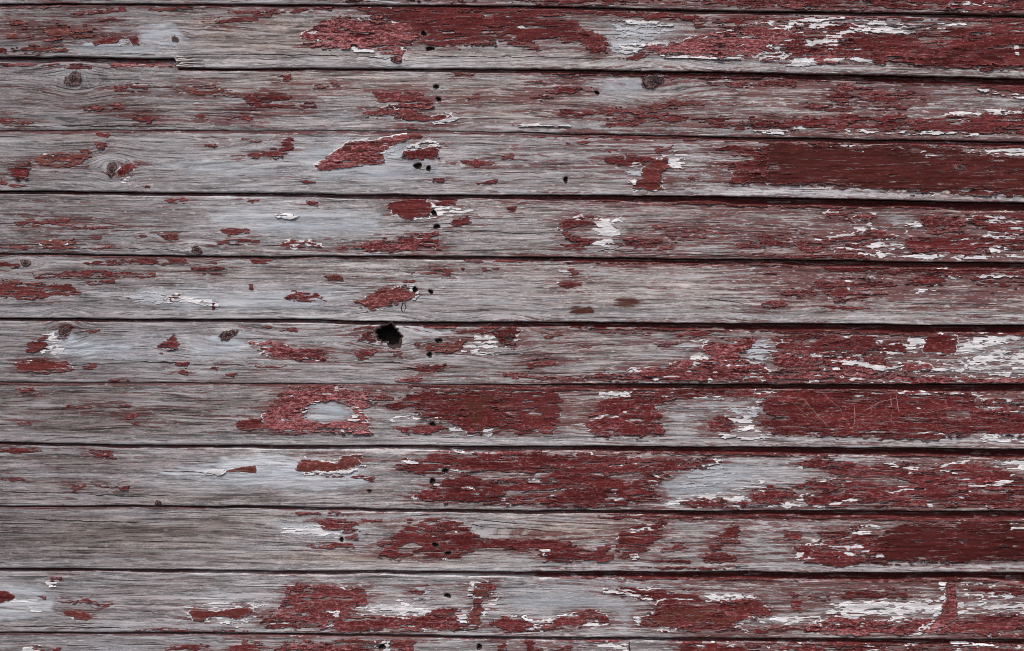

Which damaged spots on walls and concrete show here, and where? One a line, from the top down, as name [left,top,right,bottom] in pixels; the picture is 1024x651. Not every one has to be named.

peeling [83,83,154,123]
peeling [148,0,1024,311]
peeling [134,580,628,651]
peeling [235,323,1024,651]